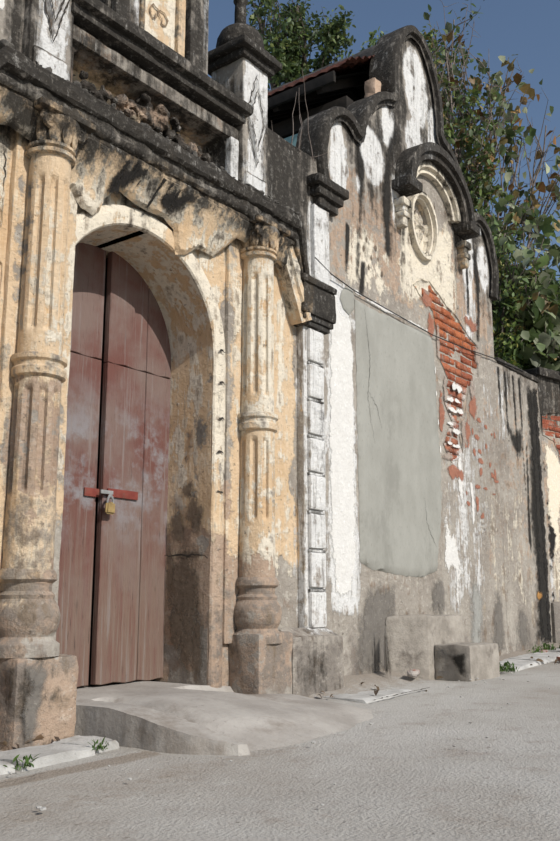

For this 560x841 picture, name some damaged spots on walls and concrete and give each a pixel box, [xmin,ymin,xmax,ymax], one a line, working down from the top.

leakage [383,129,397,256]
peeling [329,295,357,596]
flaking render [355,278,499,524]
peeling [444,488,463,605]
leakage [497,366,556,647]
peeling [541,412,560,552]
leakage [493,597,506,651]